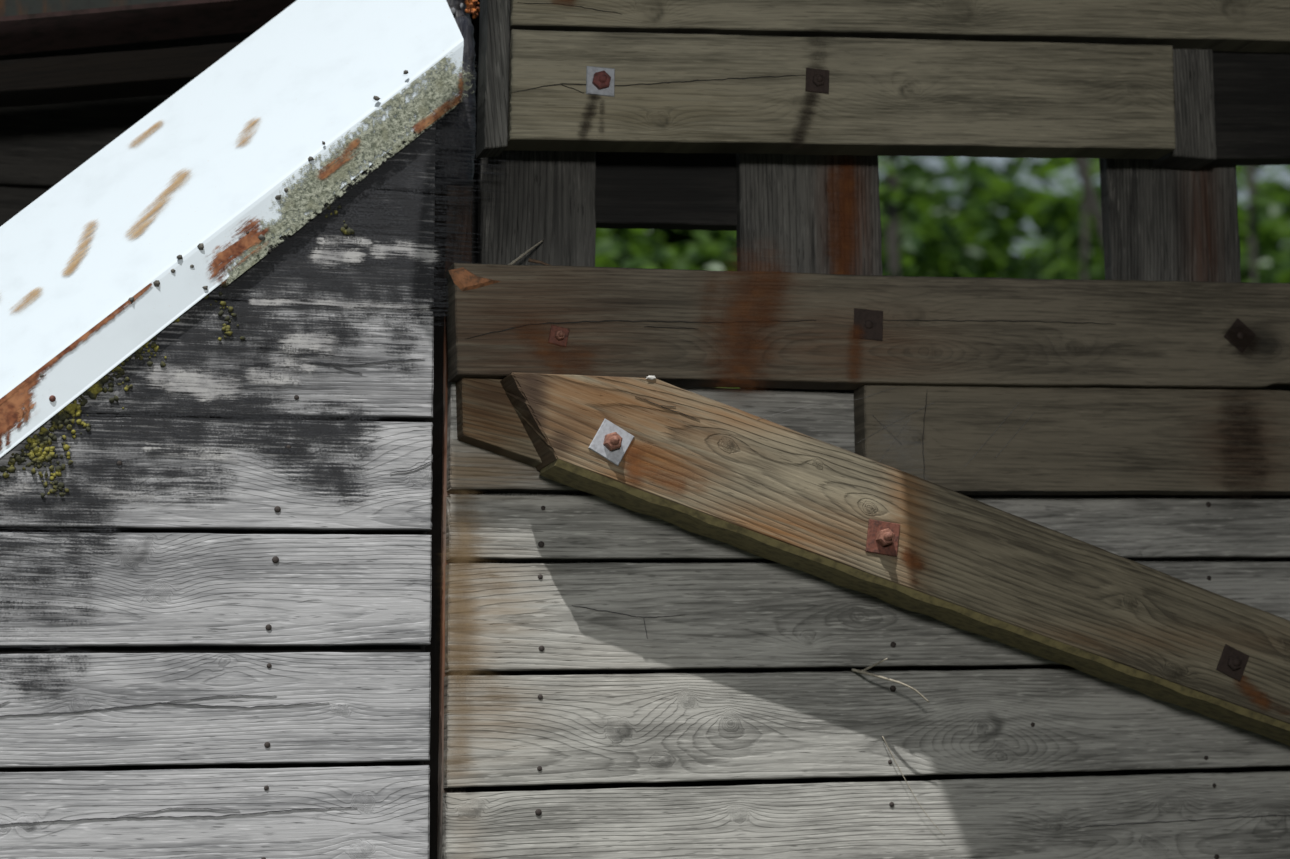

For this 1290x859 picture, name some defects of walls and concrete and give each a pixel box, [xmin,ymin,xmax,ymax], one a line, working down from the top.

corrosion [413,75,464,133]
corrosion [319,139,360,180]
corrosion [208,219,268,281]
corrosion [0,283,152,450]
damp [0,69,505,628]
damp [0,645,87,700]
crack [0,695,318,717]
crack [0,807,355,825]